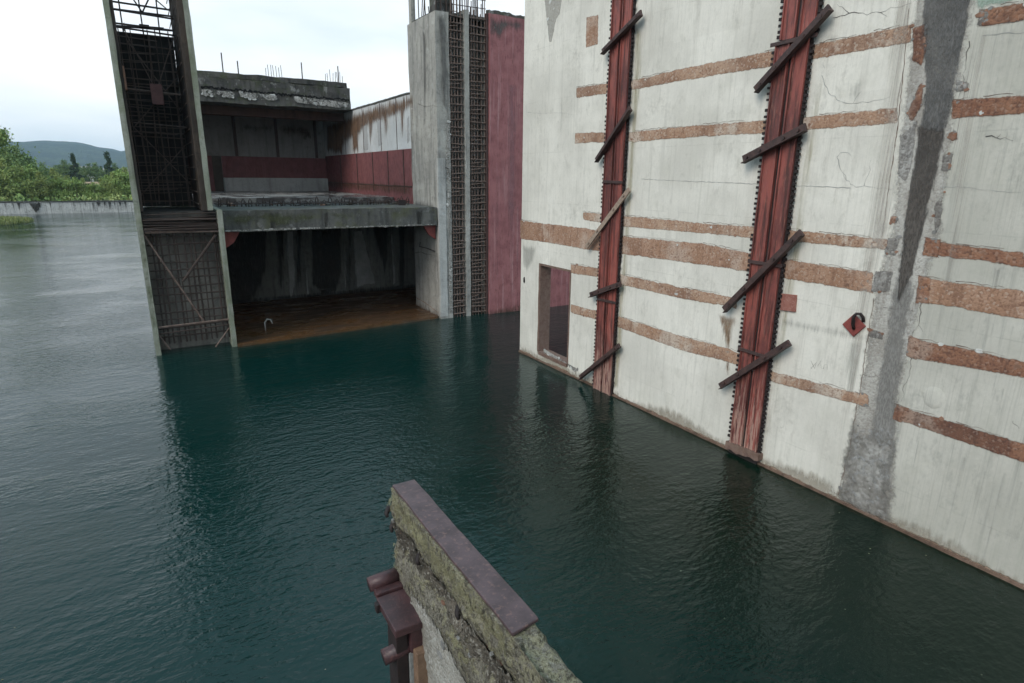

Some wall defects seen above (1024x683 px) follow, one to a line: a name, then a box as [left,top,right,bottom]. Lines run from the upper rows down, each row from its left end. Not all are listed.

spalling [631,50,774,90]
spalling [812,24,930,65]
corrosion [327,96,413,154]
spalling [628,120,766,142]
crack [814,3,910,234]
spalling [803,84,926,180]
damp [226,213,416,304]
spalling [520,211,601,251]
spalling [621,215,754,271]
spalling [783,259,893,293]
damp [867,0,970,494]
corrosion [722,318,732,342]